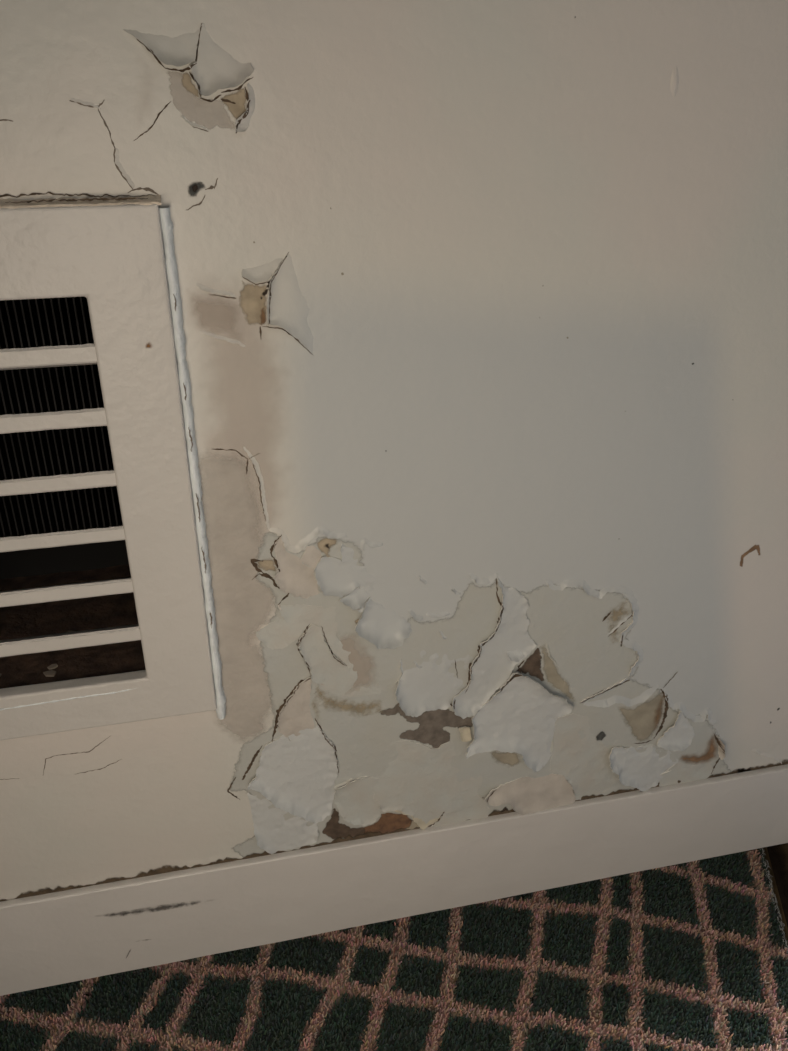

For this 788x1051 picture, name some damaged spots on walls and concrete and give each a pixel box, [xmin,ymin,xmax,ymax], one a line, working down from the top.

peeling [123,23,255,141]
crack [70,98,159,195]
crack [188,178,218,210]
peeling [196,252,313,355]
peeling [199,446,731,857]